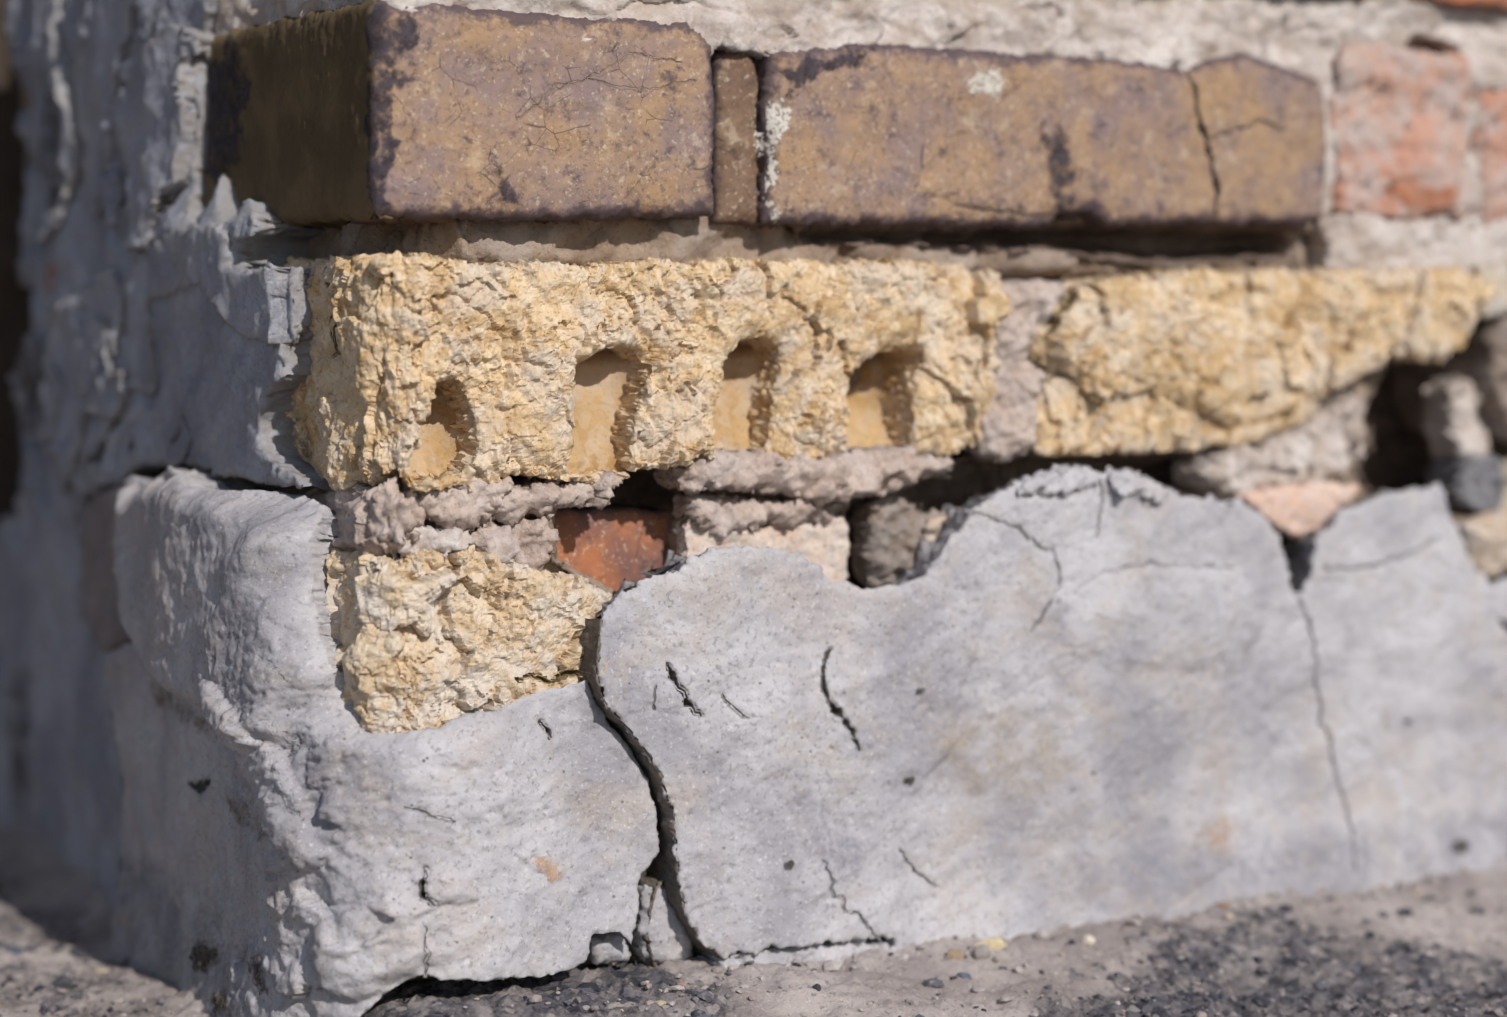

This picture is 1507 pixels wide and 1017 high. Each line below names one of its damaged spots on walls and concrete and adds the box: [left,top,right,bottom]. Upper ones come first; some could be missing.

crack [1183,62,1287,217]
crack [323,258,340,356]
spalling [5,0,1500,550]
spalling [840,496,873,589]
spalling [324,545,612,734]
crack [821,648,862,752]
crack [1294,537,1439,874]
crack [1499,618,1507,630]
crack [518,618,750,968]